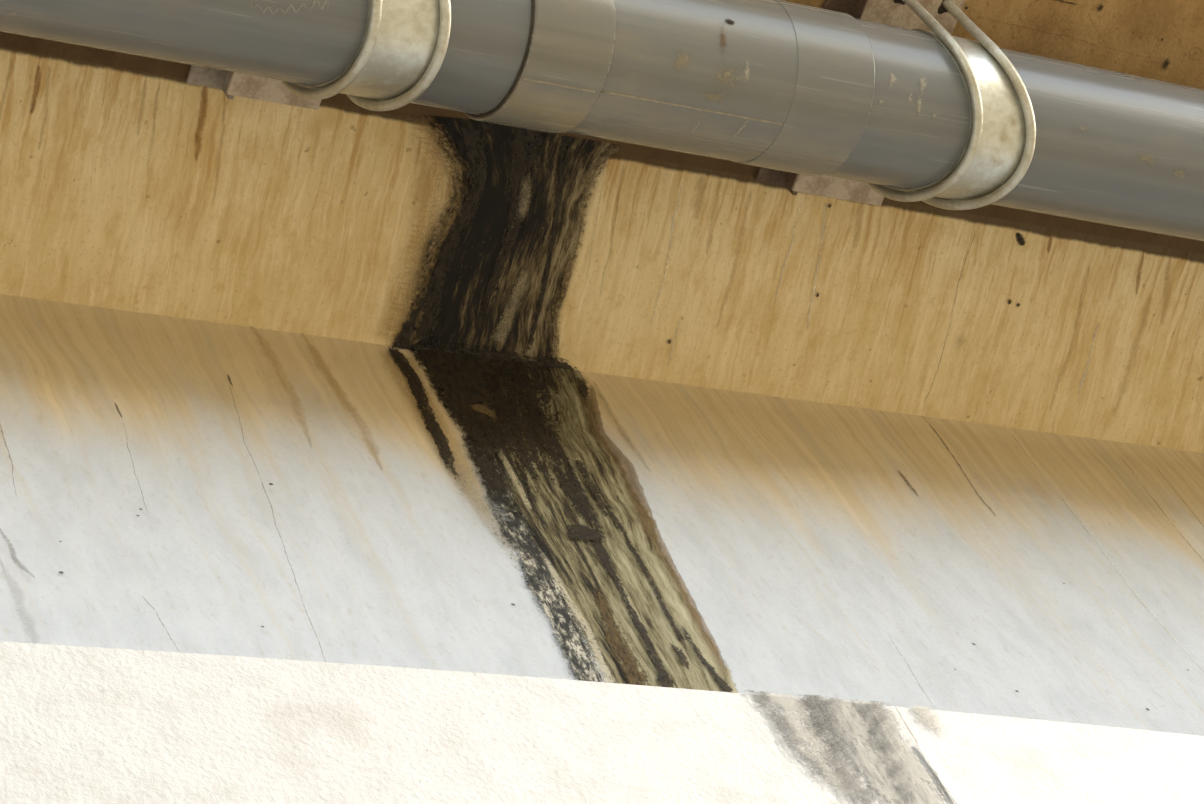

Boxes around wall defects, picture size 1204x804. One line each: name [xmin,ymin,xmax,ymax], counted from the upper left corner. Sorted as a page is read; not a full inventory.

water stain [389,115,961,804]
crack [922,416,995,515]